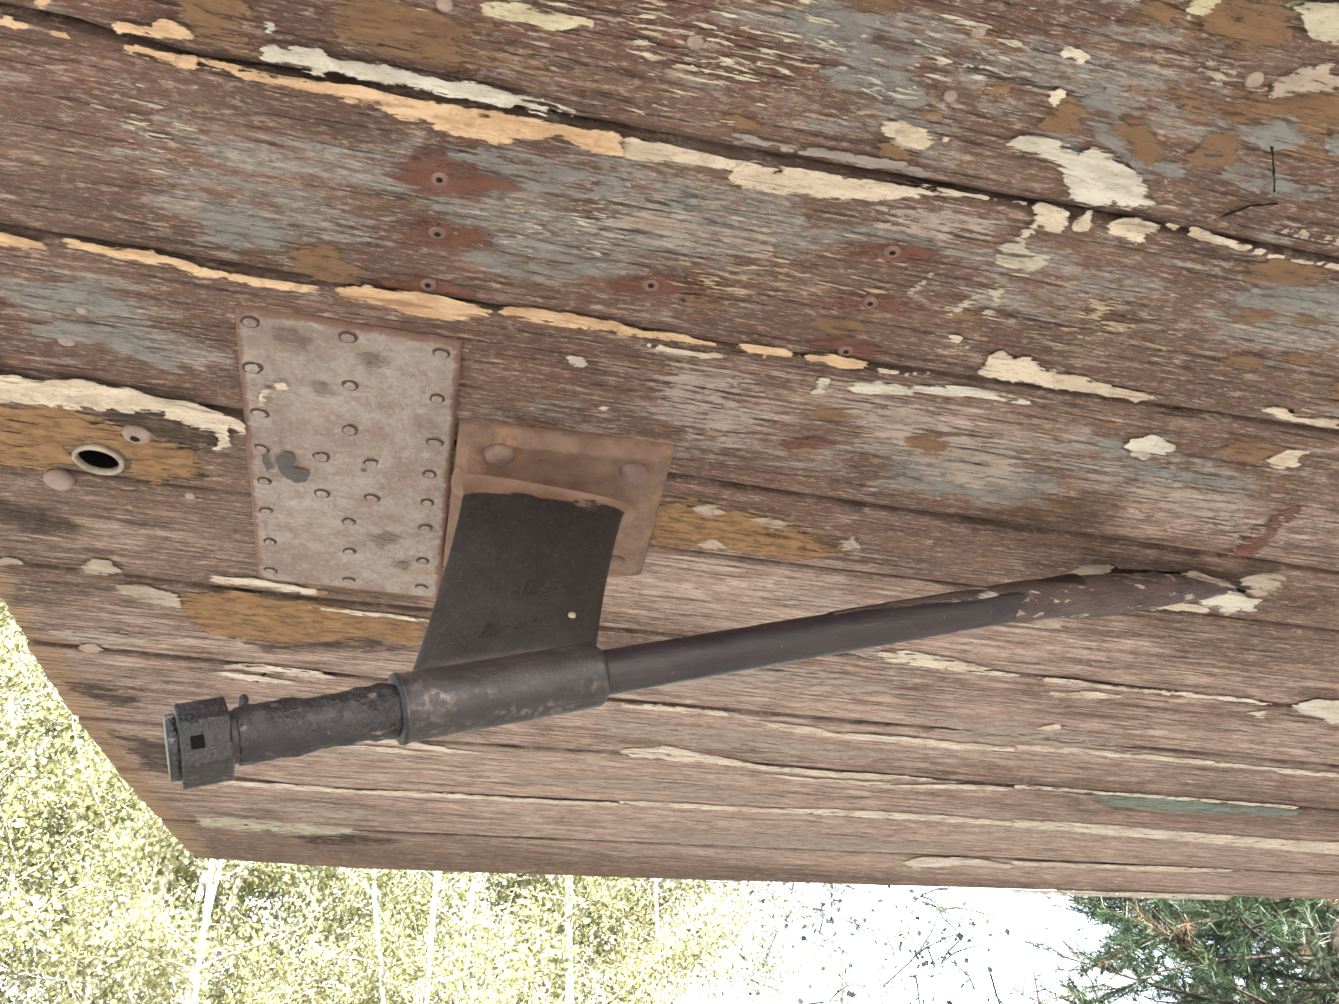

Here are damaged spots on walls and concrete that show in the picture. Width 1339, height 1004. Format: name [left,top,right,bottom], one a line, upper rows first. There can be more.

peeling [111,0,1339,286]
peeling [0,232,1188,421]
peeling [0,375,247,485]
peeling [1124,435,1176,460]
peeling [651,497,861,560]
peeling [78,559,430,646]
peeling [1133,571,1286,615]
peeling [217,663,338,684]
peeling [875,651,1273,719]
peeling [620,746,1299,809]
peeling [194,781,1339,855]
peeling [903,857,1244,872]